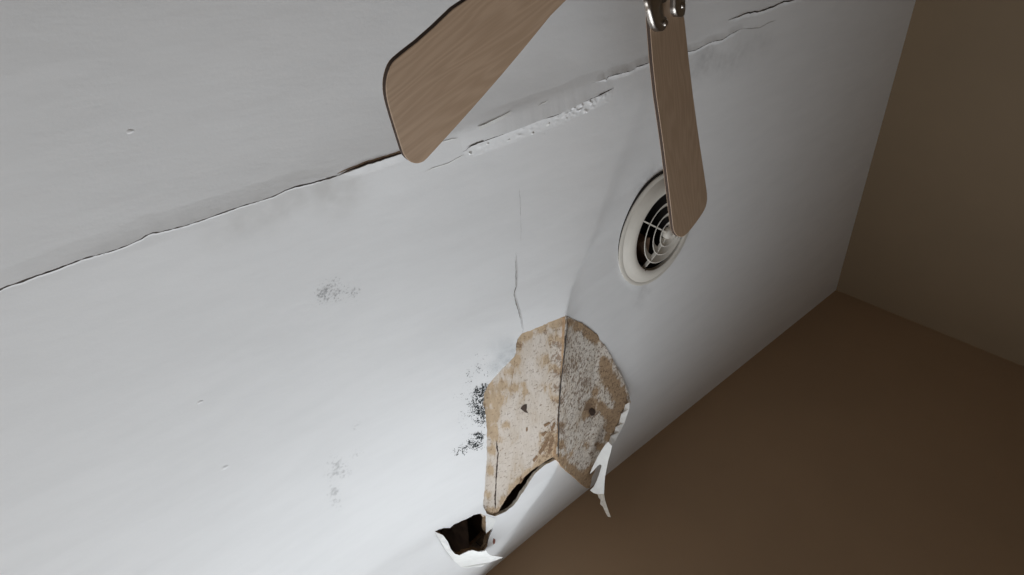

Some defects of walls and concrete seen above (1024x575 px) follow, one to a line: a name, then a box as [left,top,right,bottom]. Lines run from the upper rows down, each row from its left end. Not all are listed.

crack [687,0,802,56]
crack [0,55,650,292]
crack [514,253,524,331]
spalling [636,233,650,264]
leakage [454,366,488,455]
spalling [435,316,631,568]